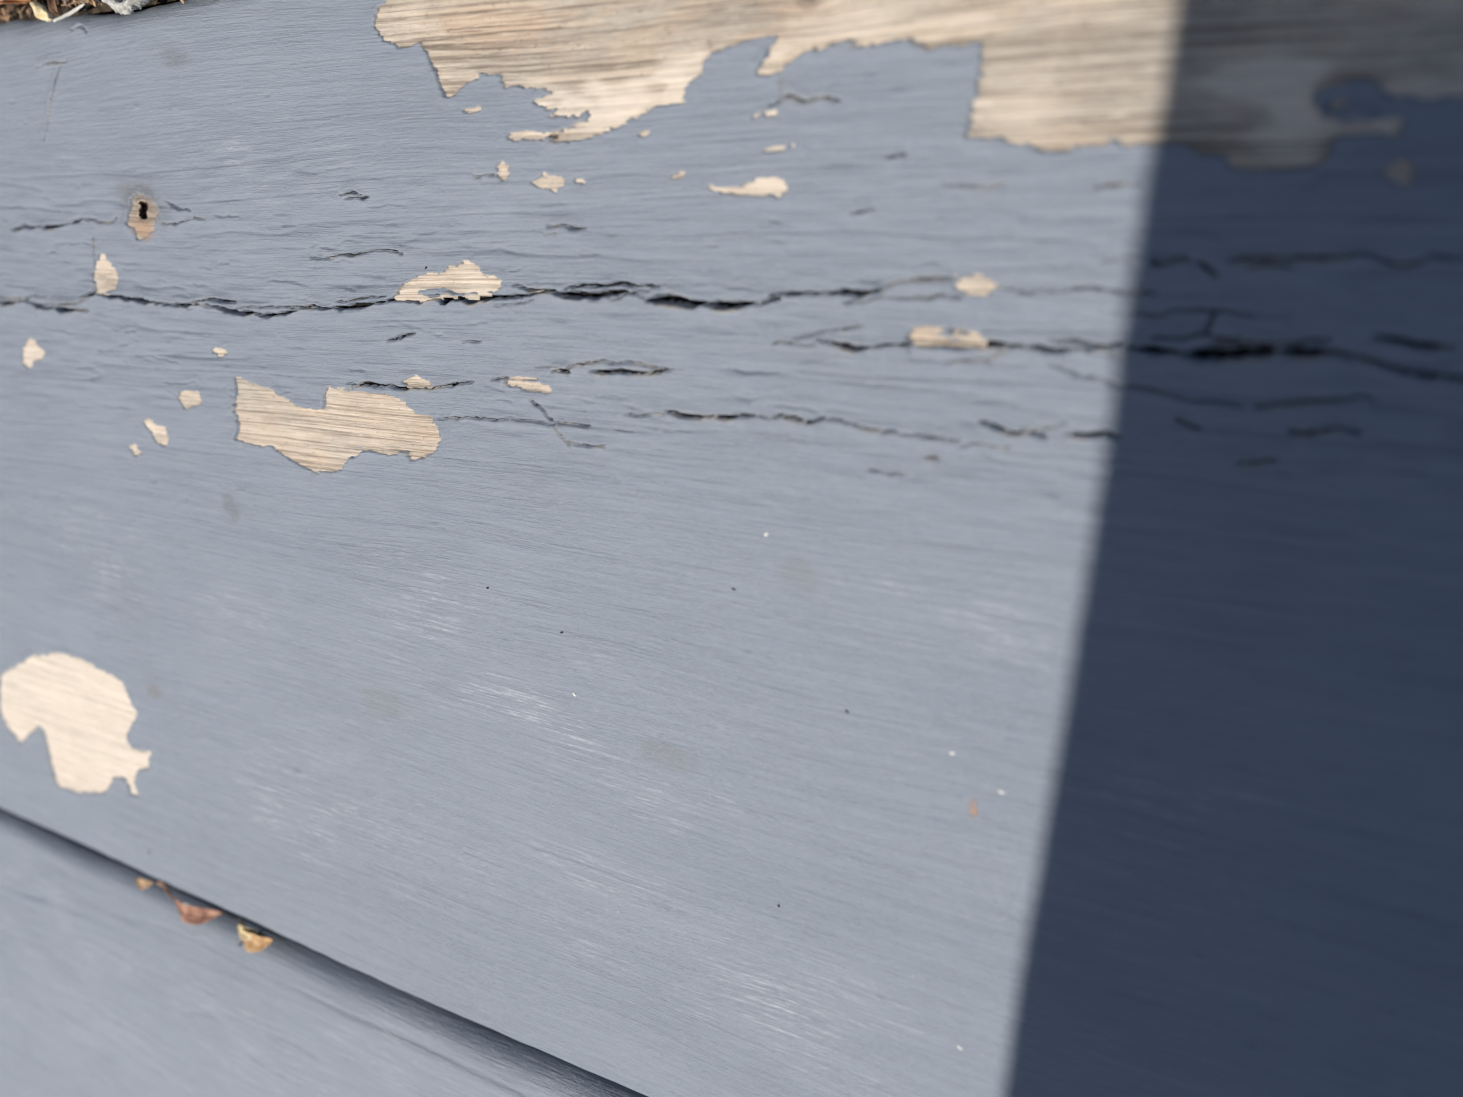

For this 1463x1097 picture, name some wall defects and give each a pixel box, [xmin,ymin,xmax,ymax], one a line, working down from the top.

peeling [375,0,1463,170]
crack [15,218,103,230]
peeling [710,177,788,198]
peeling [94,254,119,296]
crack [0,292,416,340]
peeling [394,260,502,303]
crack [443,276,963,350]
crack [948,260,1452,434]
peeling [235,375,441,473]
crack [350,359,670,447]
crack [634,410,1120,473]
peeling [0,652,151,795]